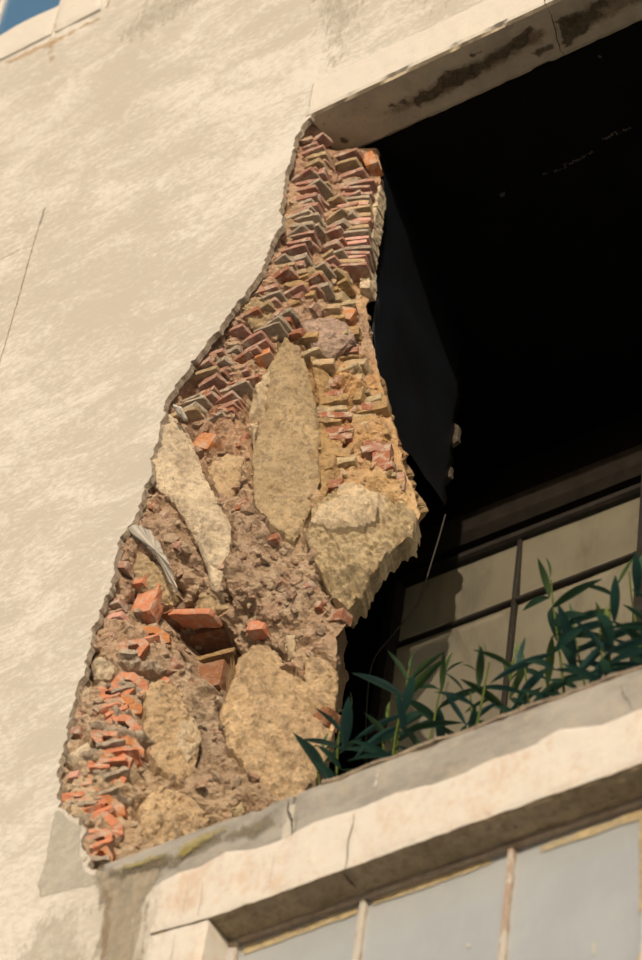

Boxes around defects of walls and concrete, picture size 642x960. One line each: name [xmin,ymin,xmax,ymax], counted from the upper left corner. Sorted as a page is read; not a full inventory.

damp [388,0,640,112]
flaking render [453,424,461,448]
spalling [60,124,429,871]
crack [344,822,356,888]